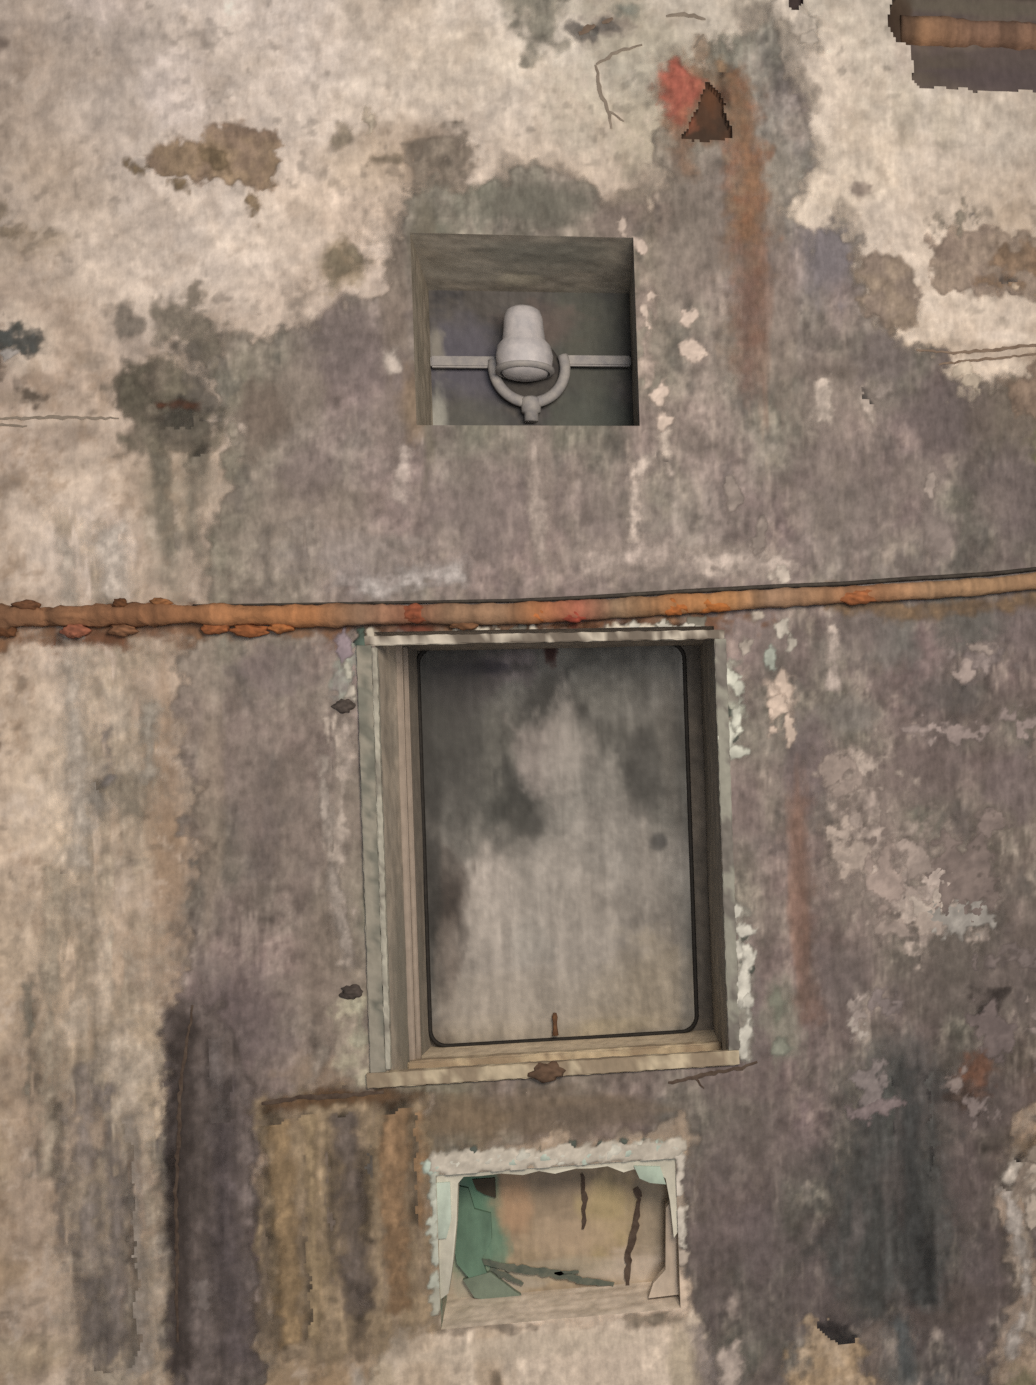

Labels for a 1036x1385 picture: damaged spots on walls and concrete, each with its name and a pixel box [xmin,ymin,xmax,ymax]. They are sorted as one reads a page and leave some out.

peeling [198,0,1036,606]
rust [11,599,41,610]
damp [57,517,130,606]
rust [112,598,128,607]
rust [0,603,547,652]
rust [563,598,731,629]
rust [825,586,1036,619]
damp [25,637,266,1385]
peeling [170,590,1036,1385]
peeling [148,1117,175,1270]